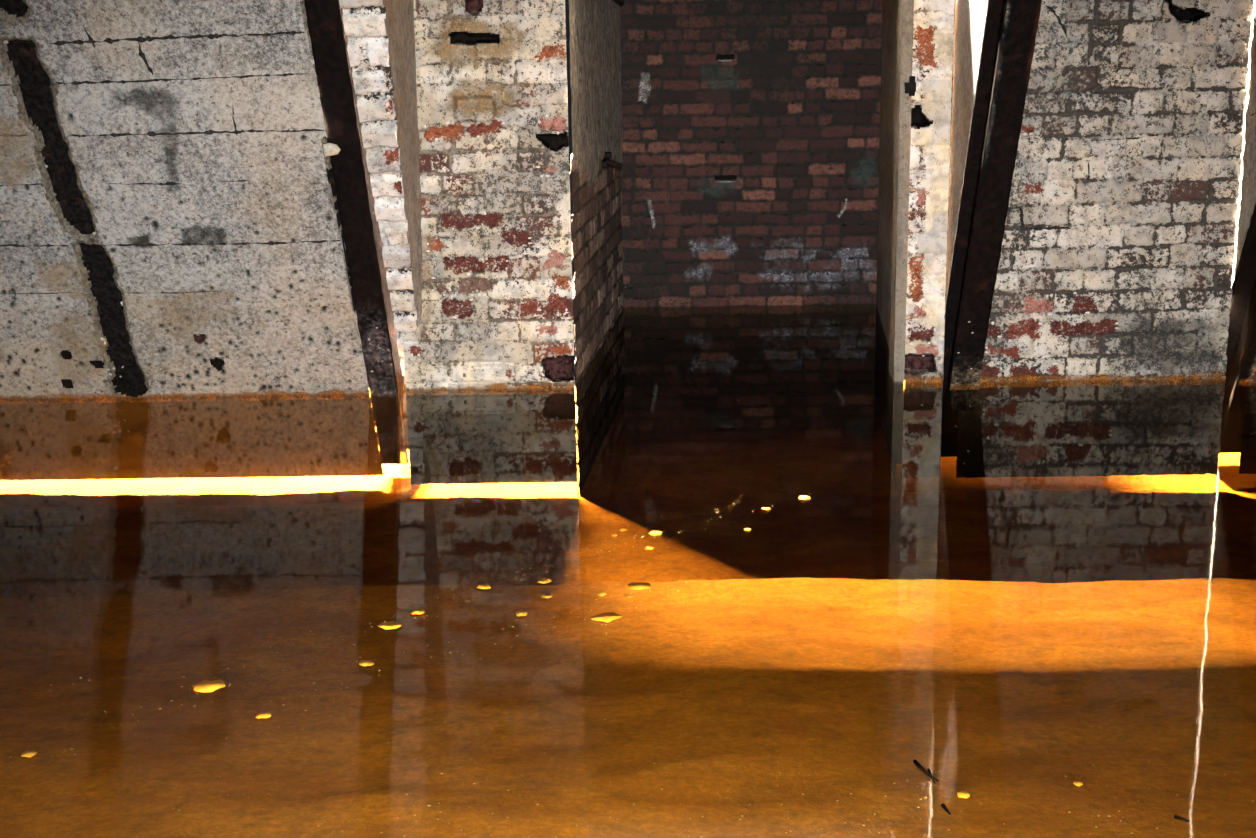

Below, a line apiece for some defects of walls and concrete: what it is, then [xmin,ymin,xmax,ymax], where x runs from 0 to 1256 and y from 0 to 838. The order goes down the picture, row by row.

spalling [1165,0,1211,24]
peeling [534,43,566,63]
peeling [422,117,506,143]
crack [110,180,179,188]
peeling [1021,182,1045,197]
crack [0,241,68,249]
crack [104,239,340,247]
peeling [426,211,532,320]
crack [1,289,75,297]
crack [135,288,218,296]
spalling [518,250,575,383]
peeling [951,292,1118,388]